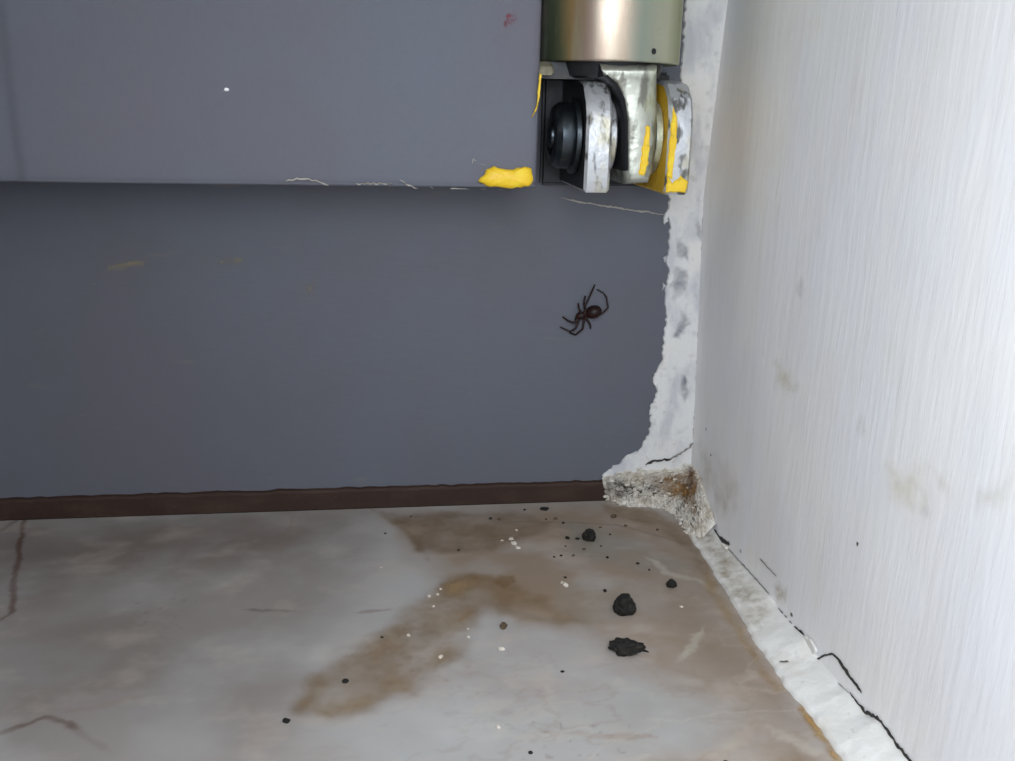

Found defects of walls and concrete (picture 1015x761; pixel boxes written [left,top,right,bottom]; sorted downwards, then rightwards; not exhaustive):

peeling [602,0,727,540]
crack [712,527,805,636]
crack [817,653,912,761]